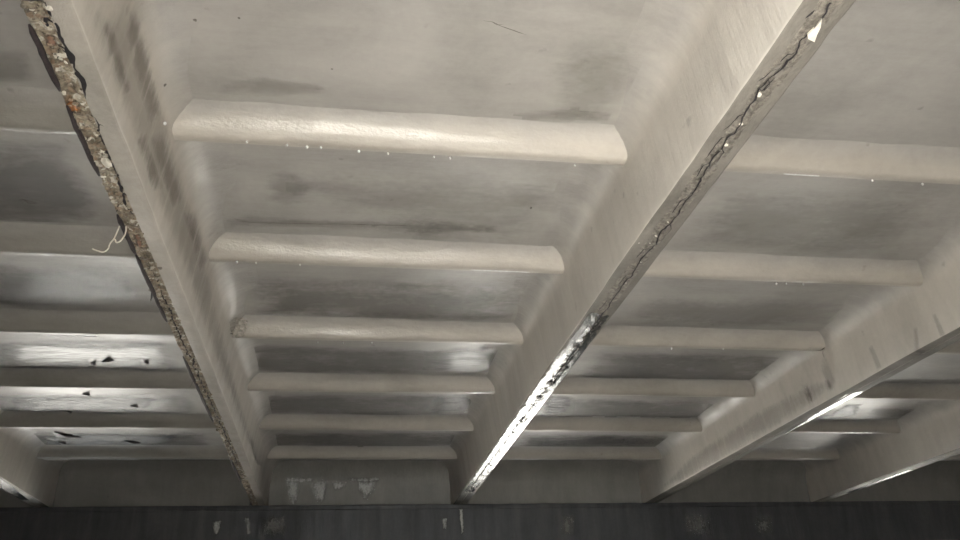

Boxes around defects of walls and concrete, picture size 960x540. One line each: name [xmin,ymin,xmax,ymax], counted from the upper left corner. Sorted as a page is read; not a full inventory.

spalling [20,0,258,506]
crack [465,0,844,493]